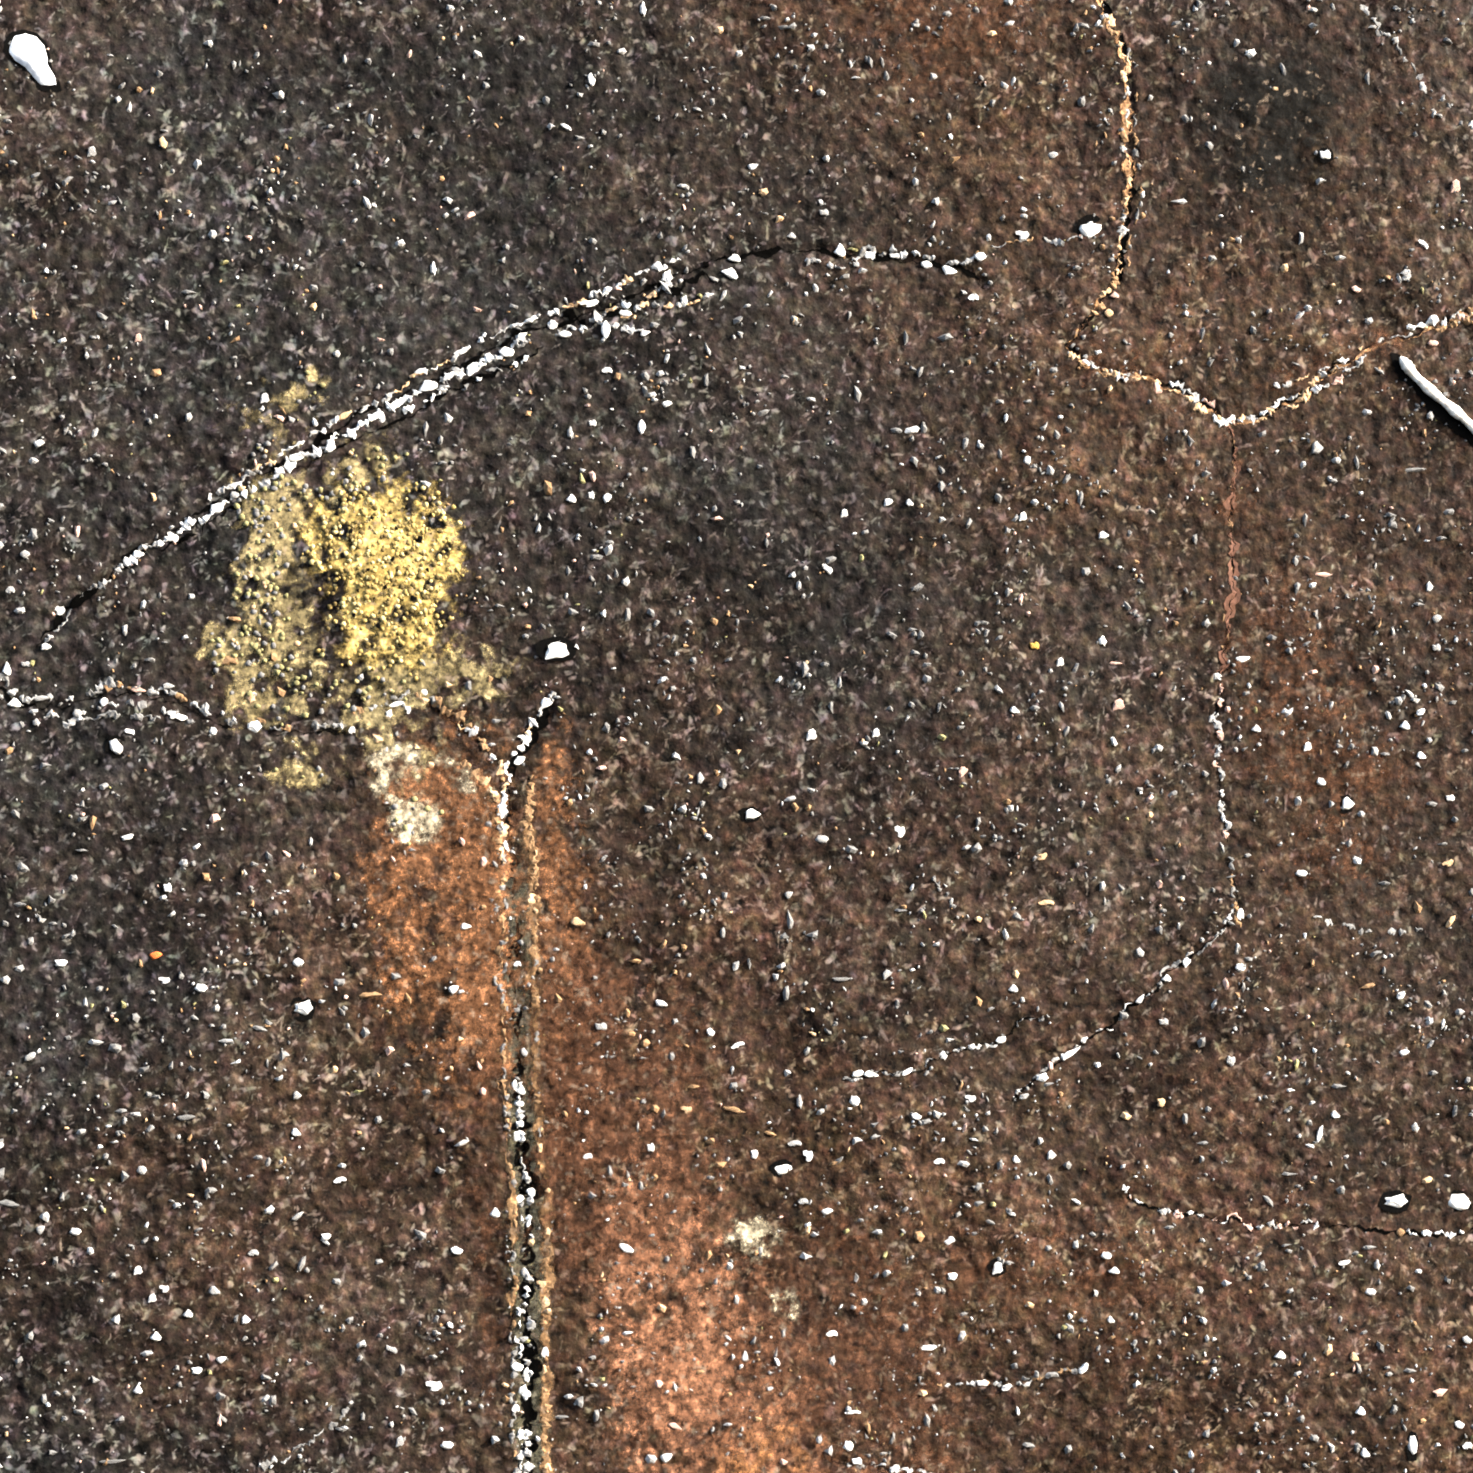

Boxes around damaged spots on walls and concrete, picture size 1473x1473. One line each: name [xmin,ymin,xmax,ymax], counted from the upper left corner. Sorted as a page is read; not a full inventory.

crack [0,232,1083,1473]
corrosion [361,723,1149,1473]
crack [1013,0,1473,1101]